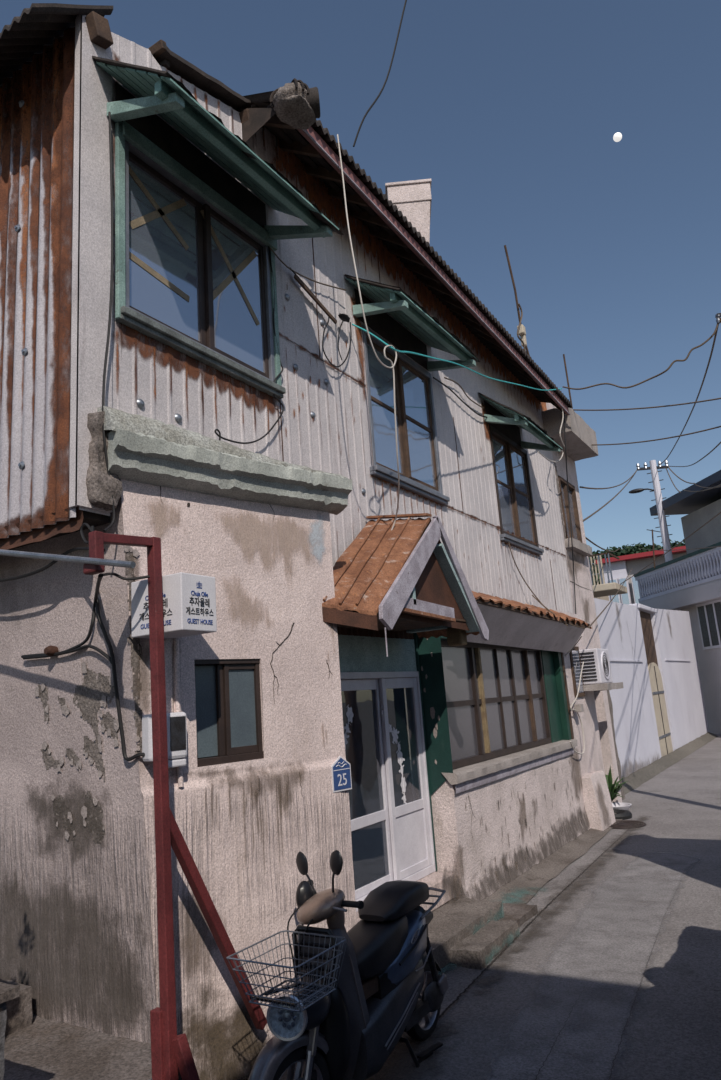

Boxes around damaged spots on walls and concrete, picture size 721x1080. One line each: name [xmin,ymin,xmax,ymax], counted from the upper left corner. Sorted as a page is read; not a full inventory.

rust [0,27,75,538]
rust [116,323,289,437]
rust [279,297,566,583]
spalling [123,546,140,611]
leakage [30,792,103,861]
spalling [35,662,119,782]
spalling [51,791,105,844]
spalling [127,633,142,754]
crack [270,623,294,704]
leakage [443,810,590,901]
leakage [570,752,582,795]
leakage [0,880,143,1034]